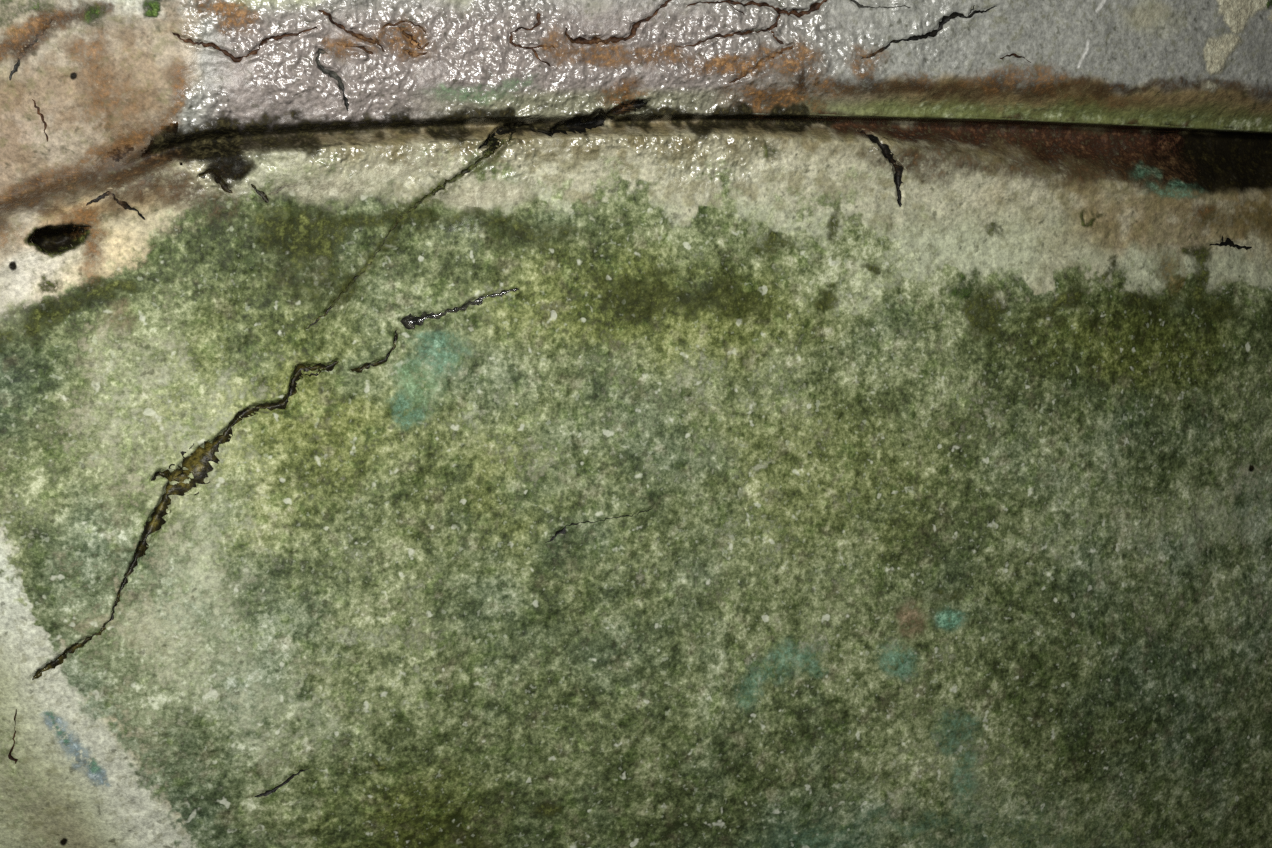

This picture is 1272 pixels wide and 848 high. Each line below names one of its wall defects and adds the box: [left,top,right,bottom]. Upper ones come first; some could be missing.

water stain [0,2,113,59]
rust [199,0,258,28]
crack [172,10,429,111]
rust [544,32,680,66]
crack [509,0,996,83]
rust [700,45,835,113]
water stain [0,101,1272,228]
spalling [25,223,91,257]
water stain [256,154,439,297]
crack [306,99,648,329]
crack [32,288,519,680]
water stain [45,712,109,786]